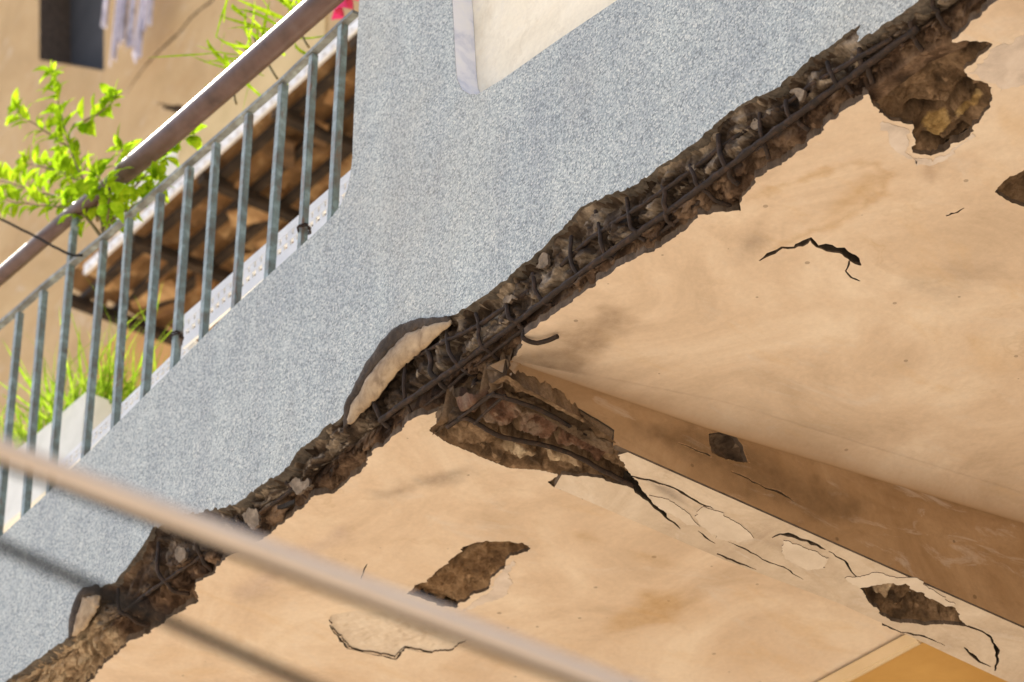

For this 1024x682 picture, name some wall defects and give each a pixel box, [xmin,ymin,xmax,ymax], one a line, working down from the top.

spalling [129,259,176,319]
spalling [196,273,216,298]
spalling [207,0,1024,543]
crack [766,237,860,263]
crack [623,470,667,516]
spalling [12,525,223,682]
spalling [408,541,528,611]
peeling [781,540,829,570]
spalling [845,572,962,622]
peeling [329,611,458,657]